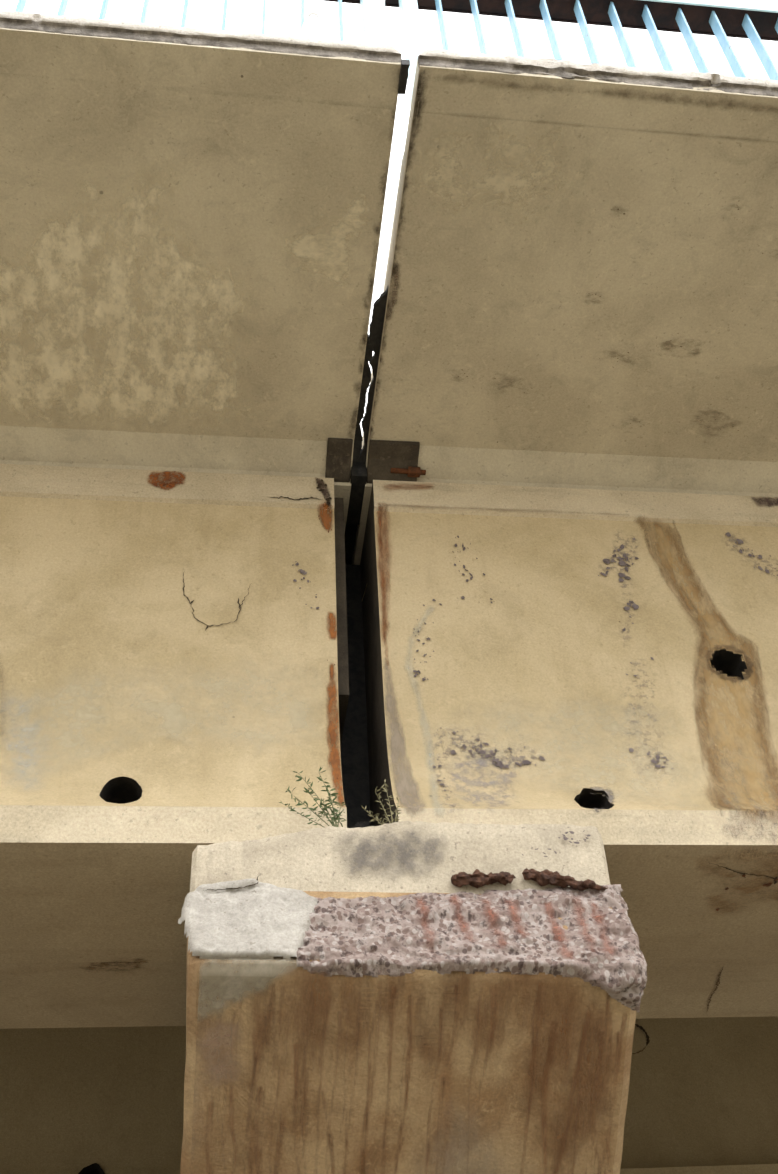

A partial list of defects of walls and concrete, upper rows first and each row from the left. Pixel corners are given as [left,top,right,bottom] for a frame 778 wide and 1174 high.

rust [148,471,185,490]
rust [318,503,332,533]
crack [183,574,250,631]
rust [328,613,337,639]
leakage [641,522,778,816]
rust [327,660,344,806]
crack [711,863,777,884]
spalling [294,884,647,1013]
crack [707,966,724,1011]